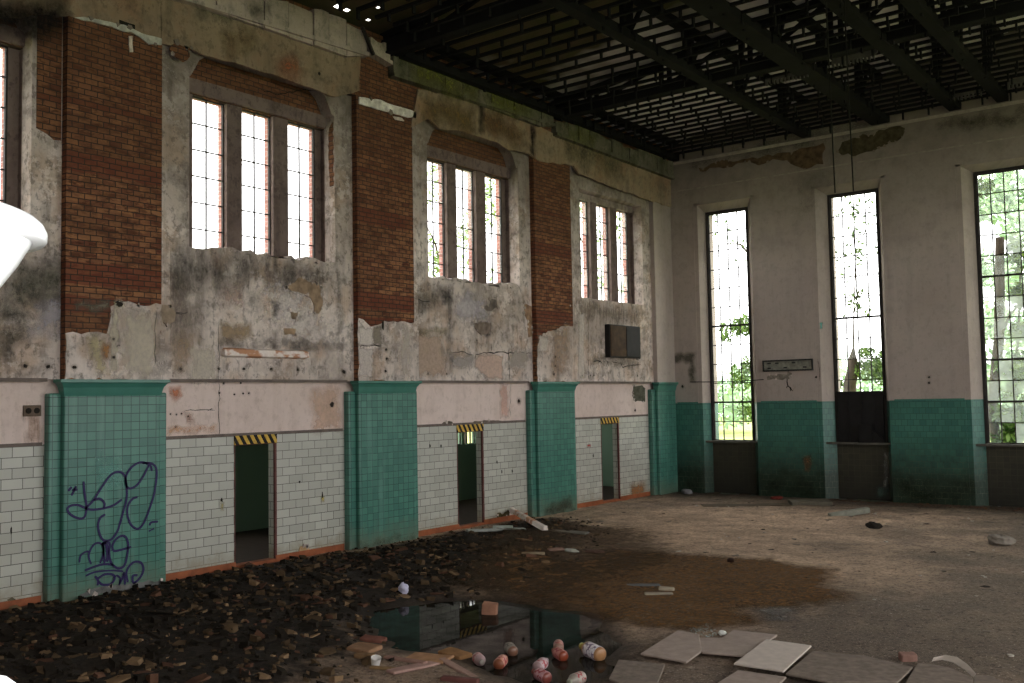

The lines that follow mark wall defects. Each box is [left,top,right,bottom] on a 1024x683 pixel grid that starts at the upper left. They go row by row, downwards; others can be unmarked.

flaking render [36,16,193,372]
flaking render [356,96,415,377]
leakage [427,103,535,155]
flaking render [522,161,571,375]
peeling [697,125,907,174]
peeling [265,276,346,379]
flaking render [632,384,646,411]